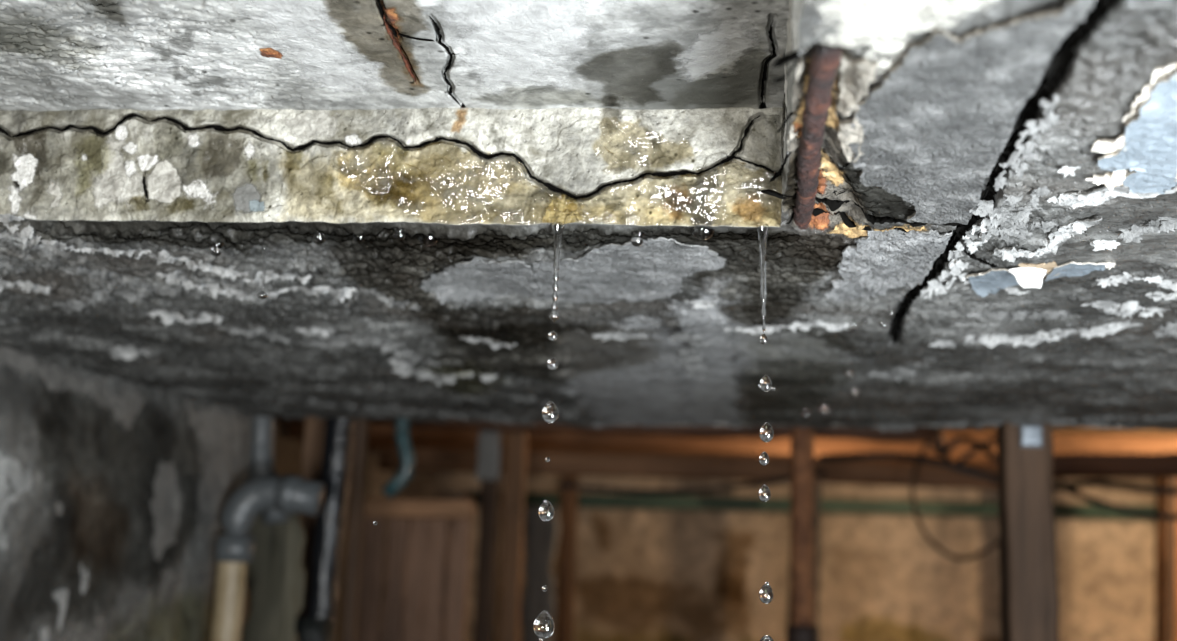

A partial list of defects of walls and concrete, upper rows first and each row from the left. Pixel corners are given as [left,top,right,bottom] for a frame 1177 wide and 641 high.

leakage [443,0,588,88]
leakage [675,14,758,80]
crack [0,0,782,199]
corrosion [793,57,810,138]
corrosion [825,62,841,129]
efflorescence [9,154,38,219]
crack [141,176,149,206]
corrosion [808,150,926,238]
crack [785,0,1116,367]
peeling [758,0,1177,381]
peeling [0,450,34,561]
peeling [39,396,533,641]